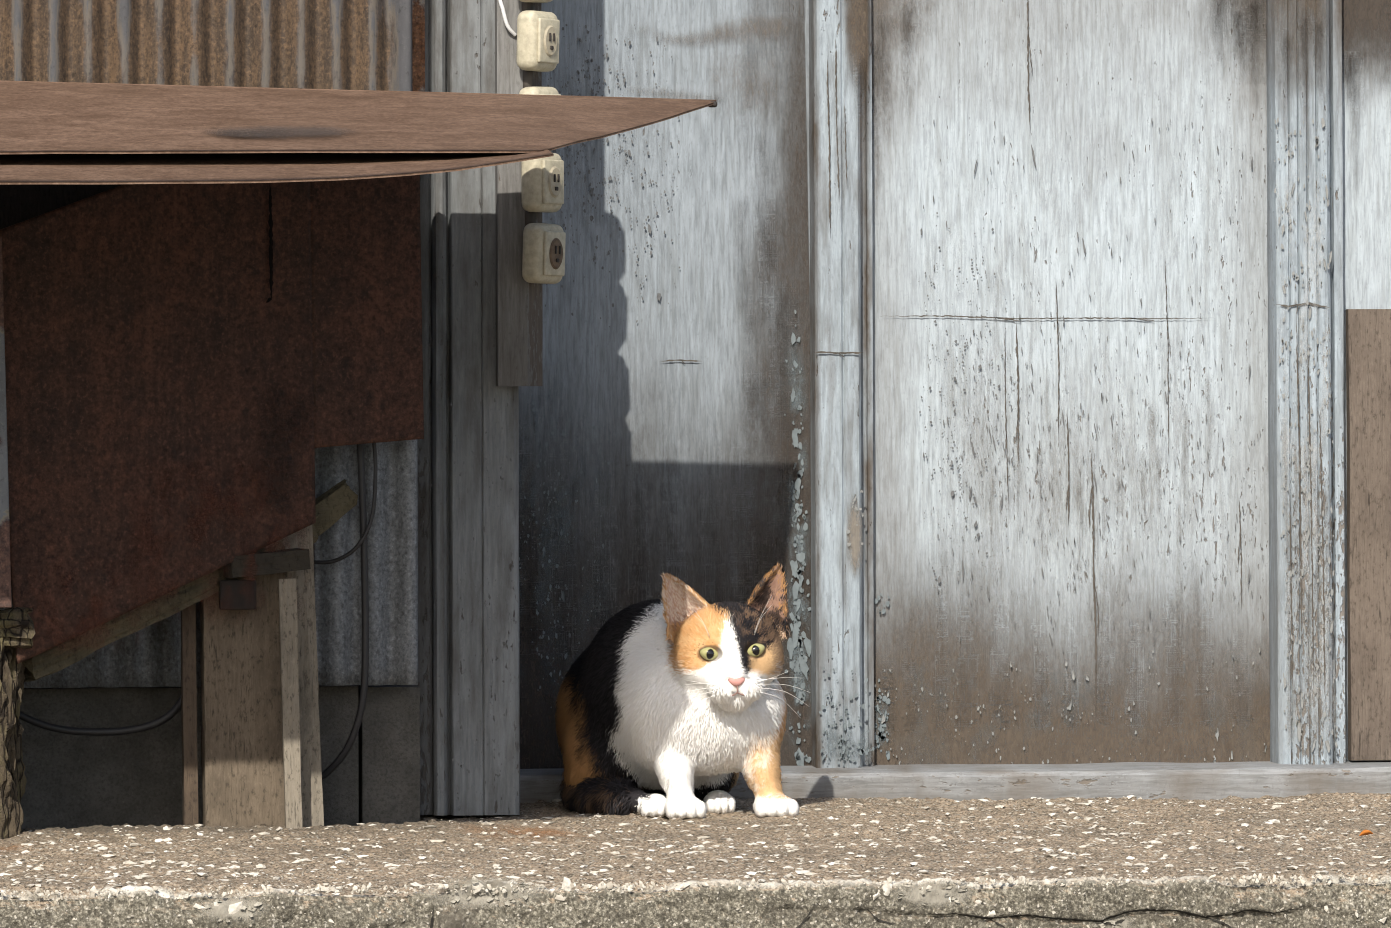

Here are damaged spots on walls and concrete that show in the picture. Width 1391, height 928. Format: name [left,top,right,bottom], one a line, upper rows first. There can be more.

corrosion [215,127,342,137]
peeling [784,195,1146,766]
crack [900,261,1201,727]
peeling [1093,480,1198,567]
peeling [1194,508,1263,610]
damp [874,600,1270,765]
crack [928,909,1294,928]